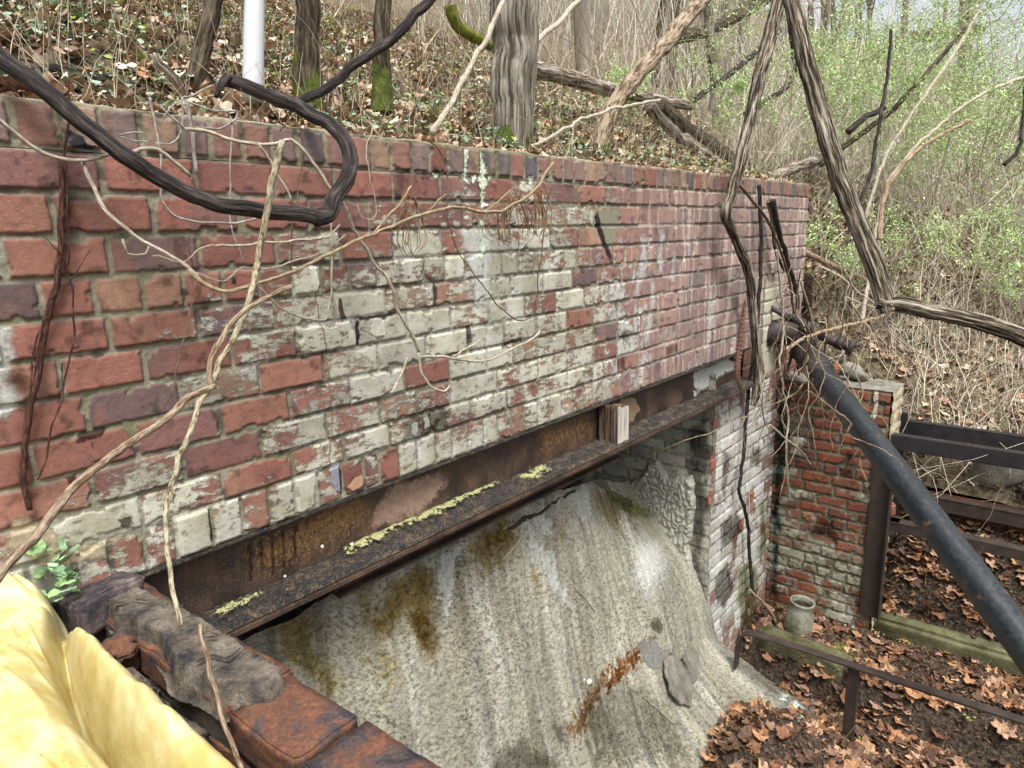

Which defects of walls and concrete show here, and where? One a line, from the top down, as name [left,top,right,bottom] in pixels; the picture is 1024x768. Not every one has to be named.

peeling [0,181,675,606]
rust [620,397,640,422]
peeling [693,348,736,397]
rust [244,472,447,573]
leakage [435,543,463,626]
crack [507,489,576,531]
leakage [520,512,575,609]
leakage [569,482,593,534]
peeling [707,372,871,649]